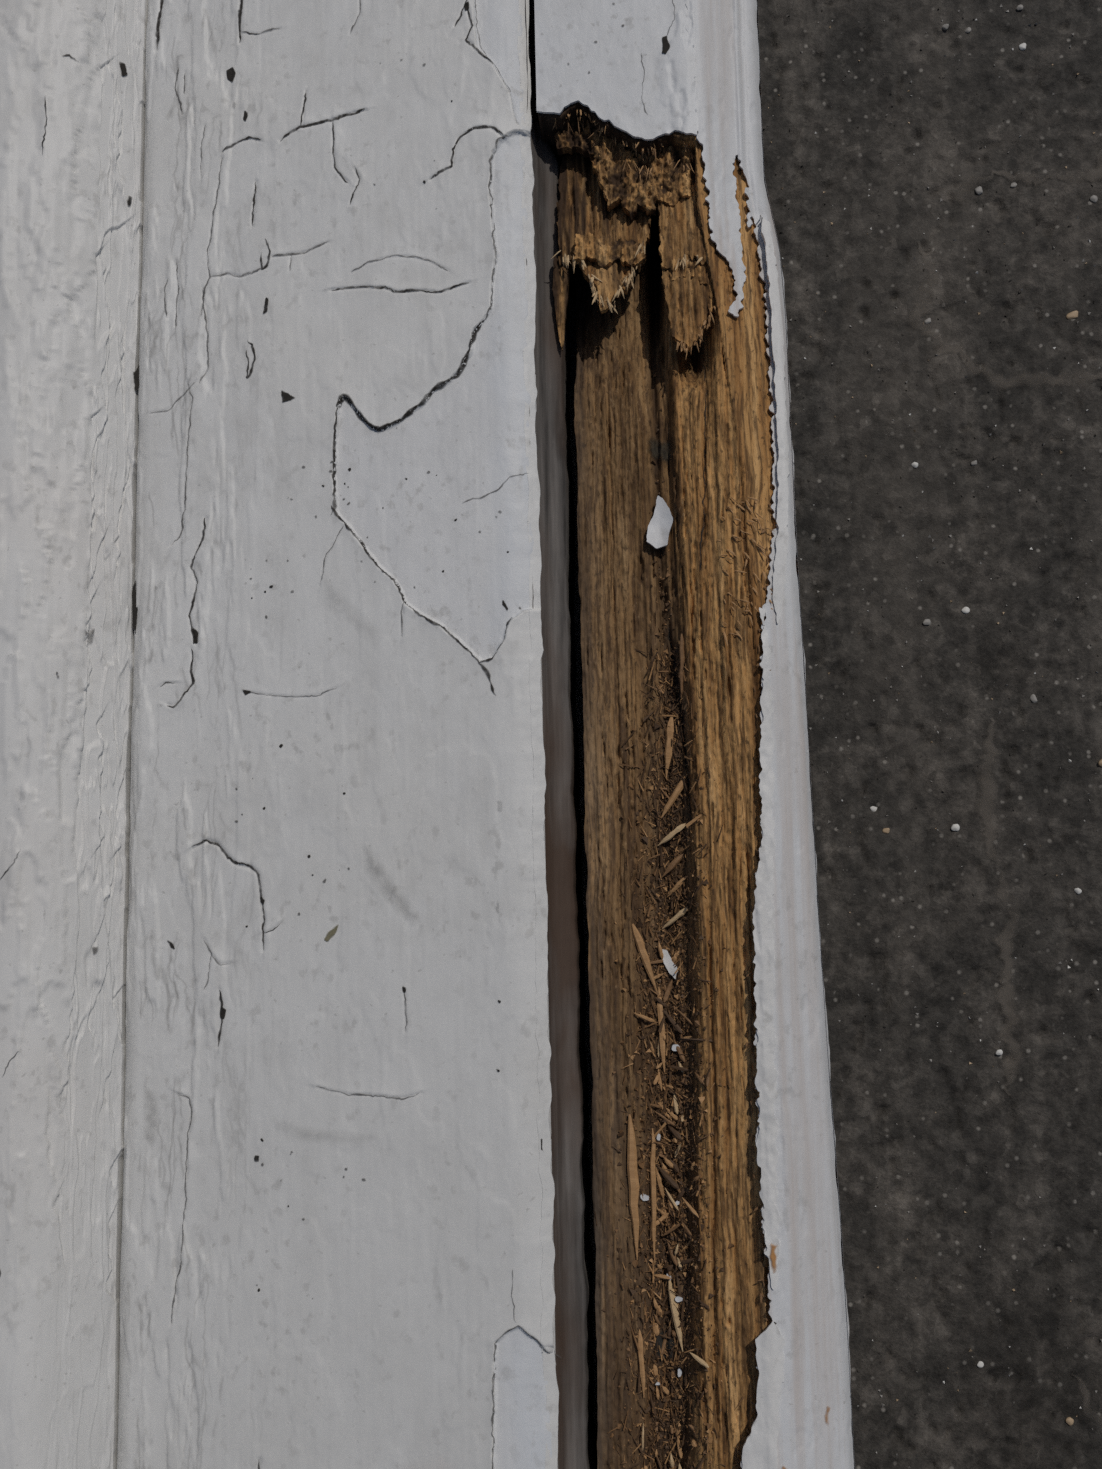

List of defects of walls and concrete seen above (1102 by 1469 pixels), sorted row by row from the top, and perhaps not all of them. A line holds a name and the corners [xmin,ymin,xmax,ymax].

crack [455,0,492,62]
crack [432,125,503,178]
crack [333,255,469,293]
crack [151,0,365,708]
crack [193,839,279,950]
peeling [491,1269,560,1469]
peeling [742,1320,785,1469]